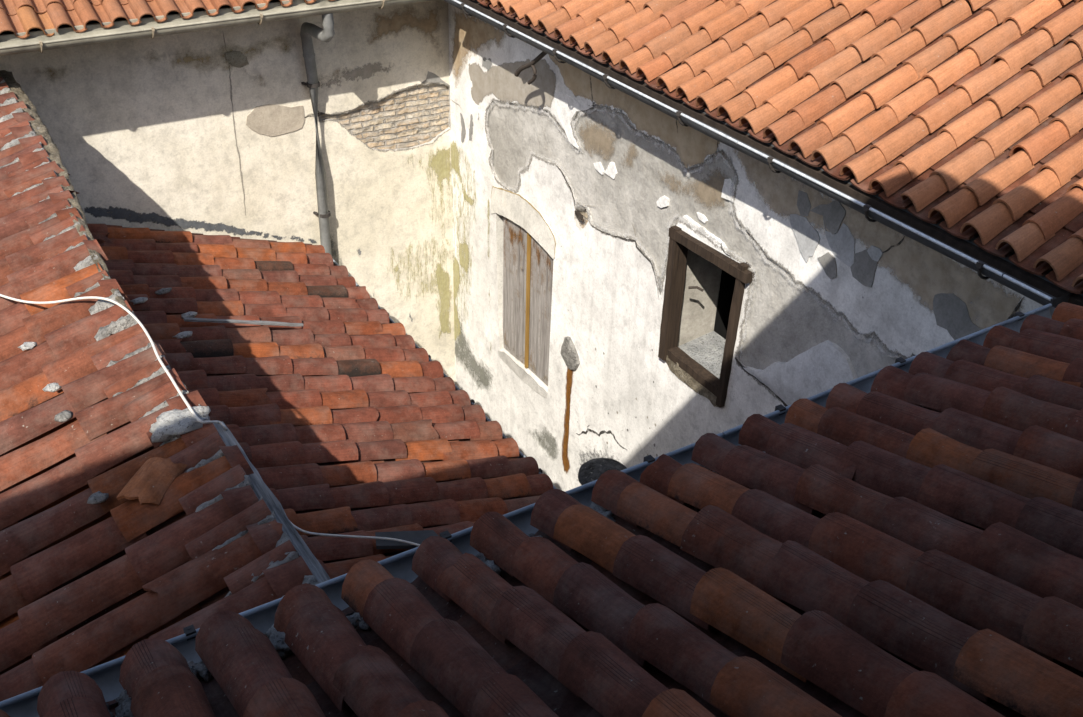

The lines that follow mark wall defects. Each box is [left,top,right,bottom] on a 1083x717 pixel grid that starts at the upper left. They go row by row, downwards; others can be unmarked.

flaking render [318,71,451,152]
water stain [392,150,491,387]
peeling [485,98,915,407]
rust [562,368,573,473]
crack [576,425,627,450]